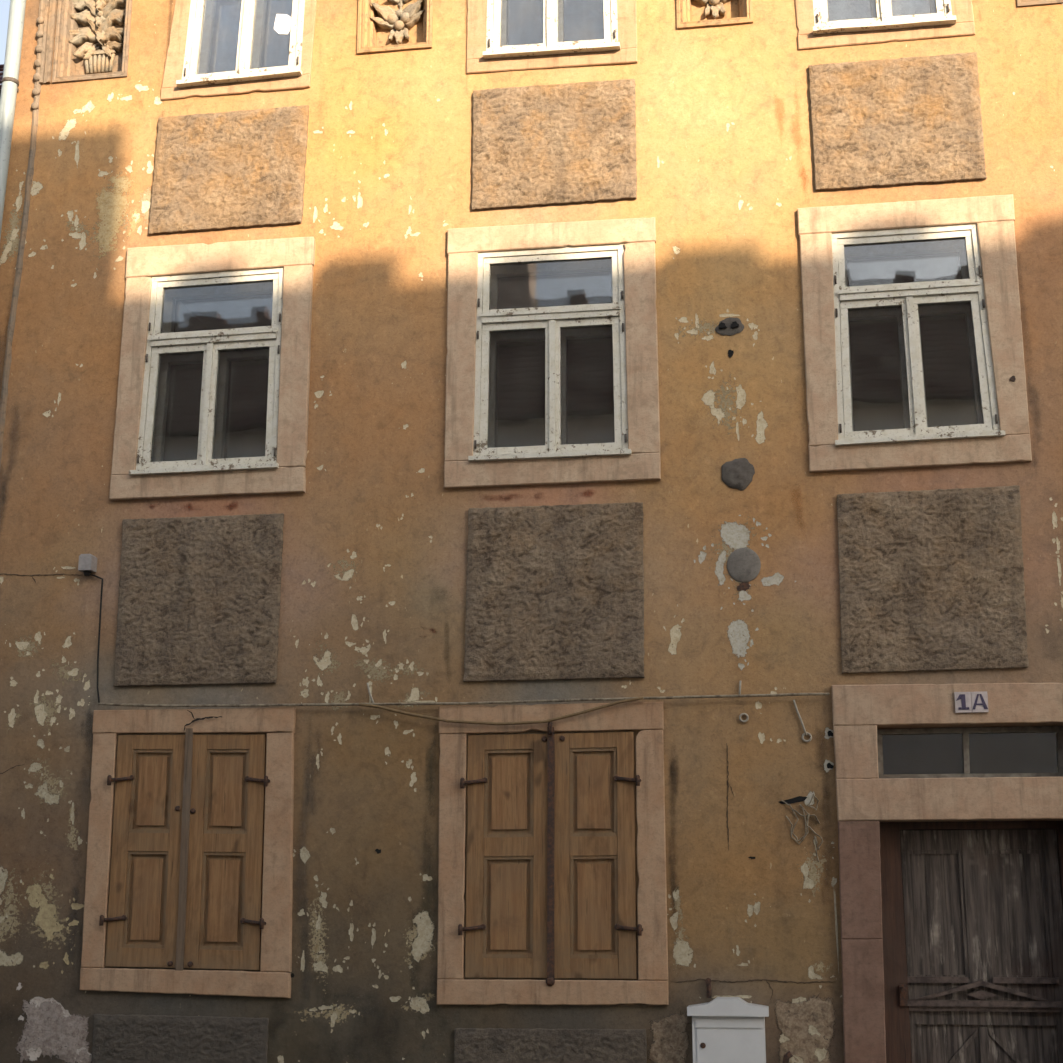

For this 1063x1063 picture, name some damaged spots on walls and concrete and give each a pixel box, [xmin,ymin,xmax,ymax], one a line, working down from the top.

peeling [52,101,95,166]
peeling [61,154,154,279]
peeling [701,361,768,444]
peeling [293,549,437,745]
peeling [694,514,796,670]
peeling [4,631,90,850]
crack [184,710,222,731]
crack [726,743,734,850]
peeling [0,850,84,974]
peeling [294,875,438,1033]
spalling [775,836,842,1063]
spalling [16,982,92,1063]